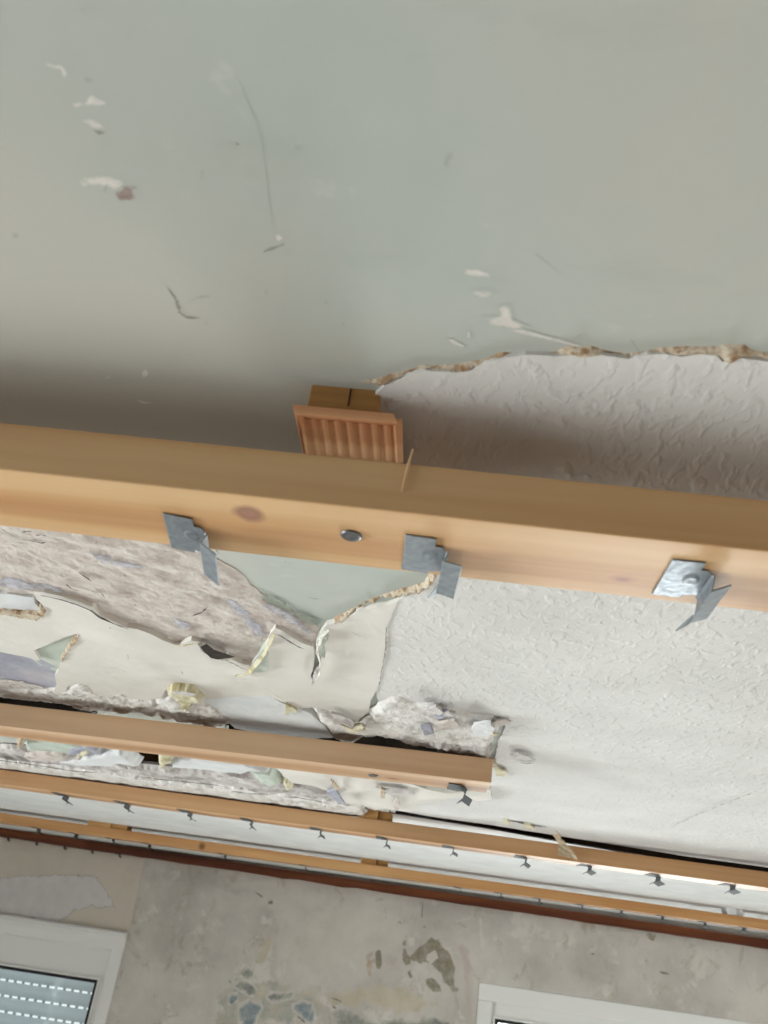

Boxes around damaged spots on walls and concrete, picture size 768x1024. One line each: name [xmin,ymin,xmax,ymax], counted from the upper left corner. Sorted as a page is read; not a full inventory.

spalling [74,172,140,203]
crack [160,283,212,327]
peeling [0,525,511,817]